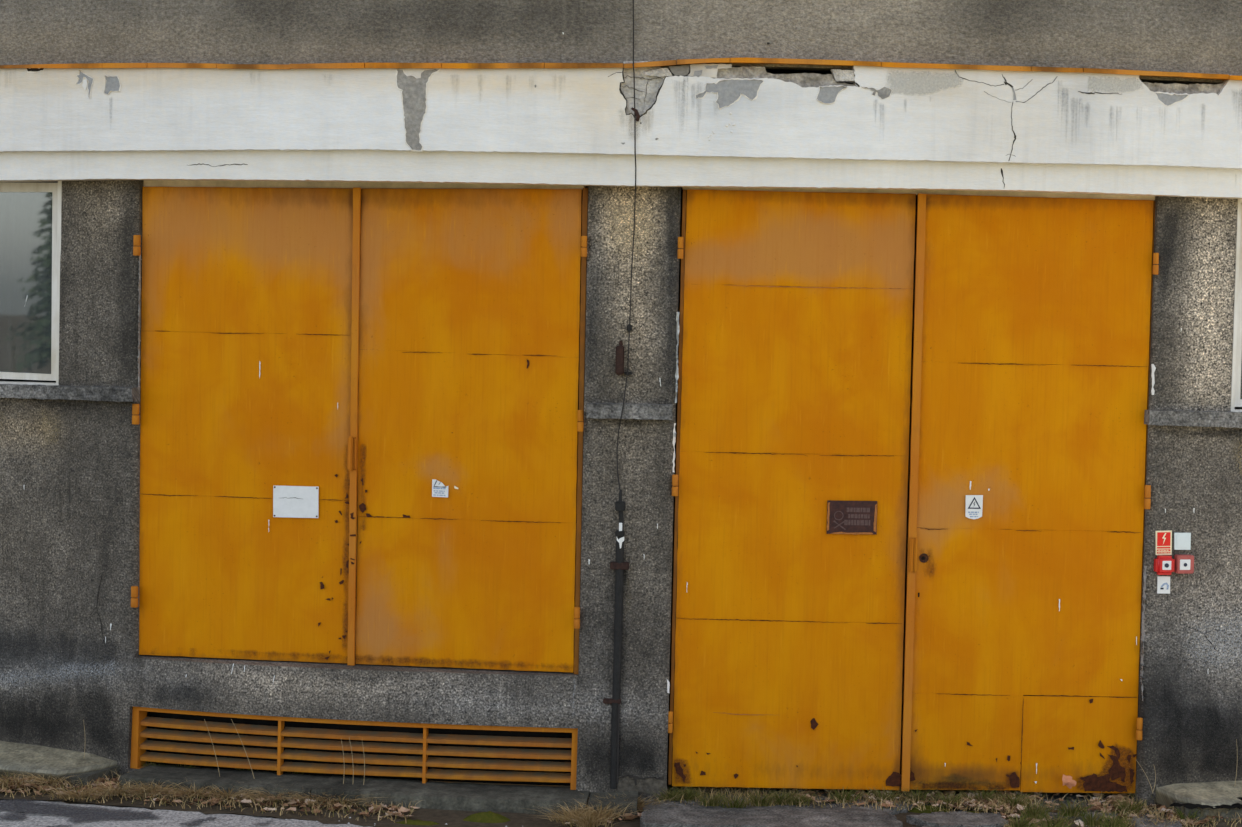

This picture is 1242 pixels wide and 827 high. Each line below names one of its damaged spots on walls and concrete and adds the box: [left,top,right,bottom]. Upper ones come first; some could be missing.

peeling [76,70,121,99]
peeling [395,68,441,152]
spalling [619,61,959,124]
crack [955,70,1057,187]
flaking render [1078,78,1226,106]
rust [335,447,410,585]
rust [674,751,711,783]
rust [886,768,916,787]
rust [996,755,1020,788]
rust [1078,740,1136,792]